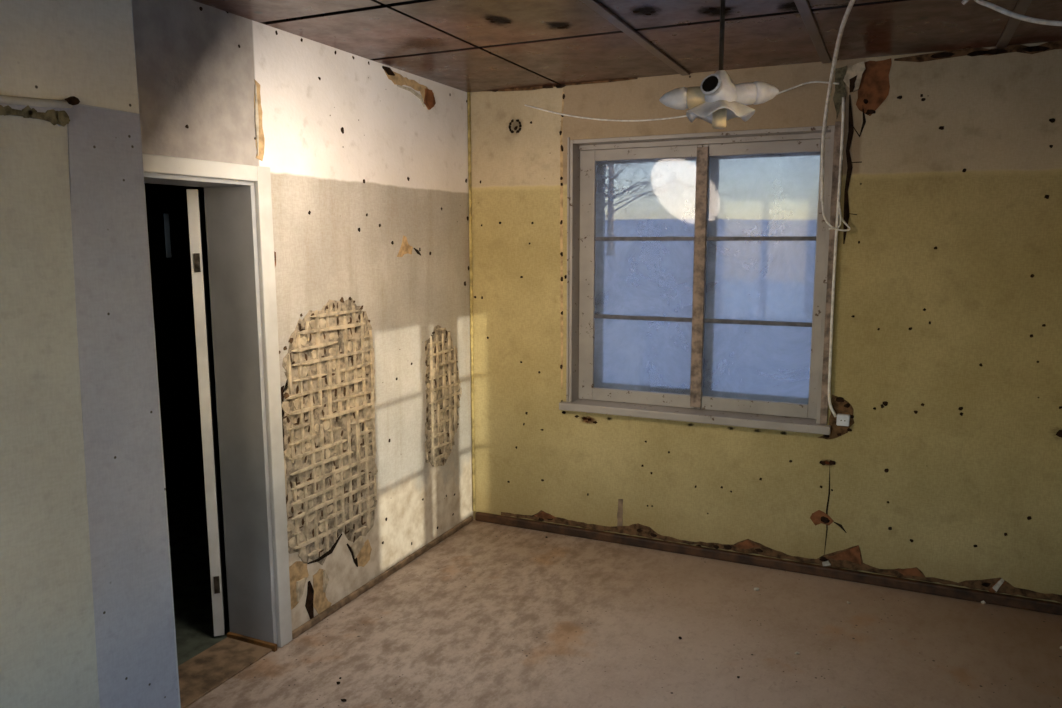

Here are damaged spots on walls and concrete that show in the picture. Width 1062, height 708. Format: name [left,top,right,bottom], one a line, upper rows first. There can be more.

peeling [382,66,436,110]
spalling [833,58,892,117]
flaking render [279,297,378,619]
flaking render [425,325,462,468]
spalling [818,395,854,440]
spalling [810,469,846,554]